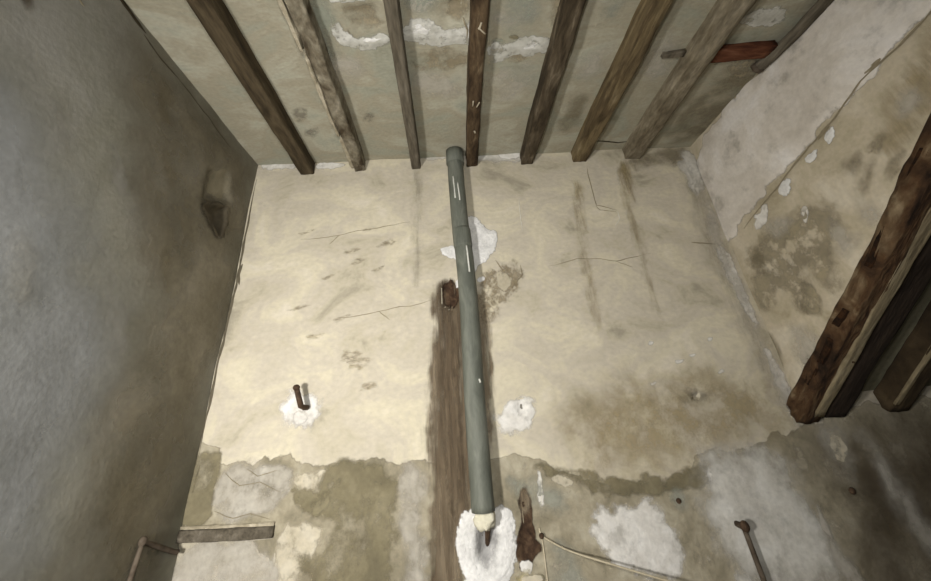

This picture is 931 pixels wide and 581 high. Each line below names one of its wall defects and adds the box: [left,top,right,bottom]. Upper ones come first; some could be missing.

peeling [329,0,390,51]
peeling [403,0,469,70]
peeling [487,35,550,63]
peeling [824,127,835,144]
peeling [778,179,791,196]
leakage [480,266,522,316]
rust [426,281,471,581]
leakage [536,464,712,496]
leakage [291,459,398,581]
leakage [850,433,931,581]